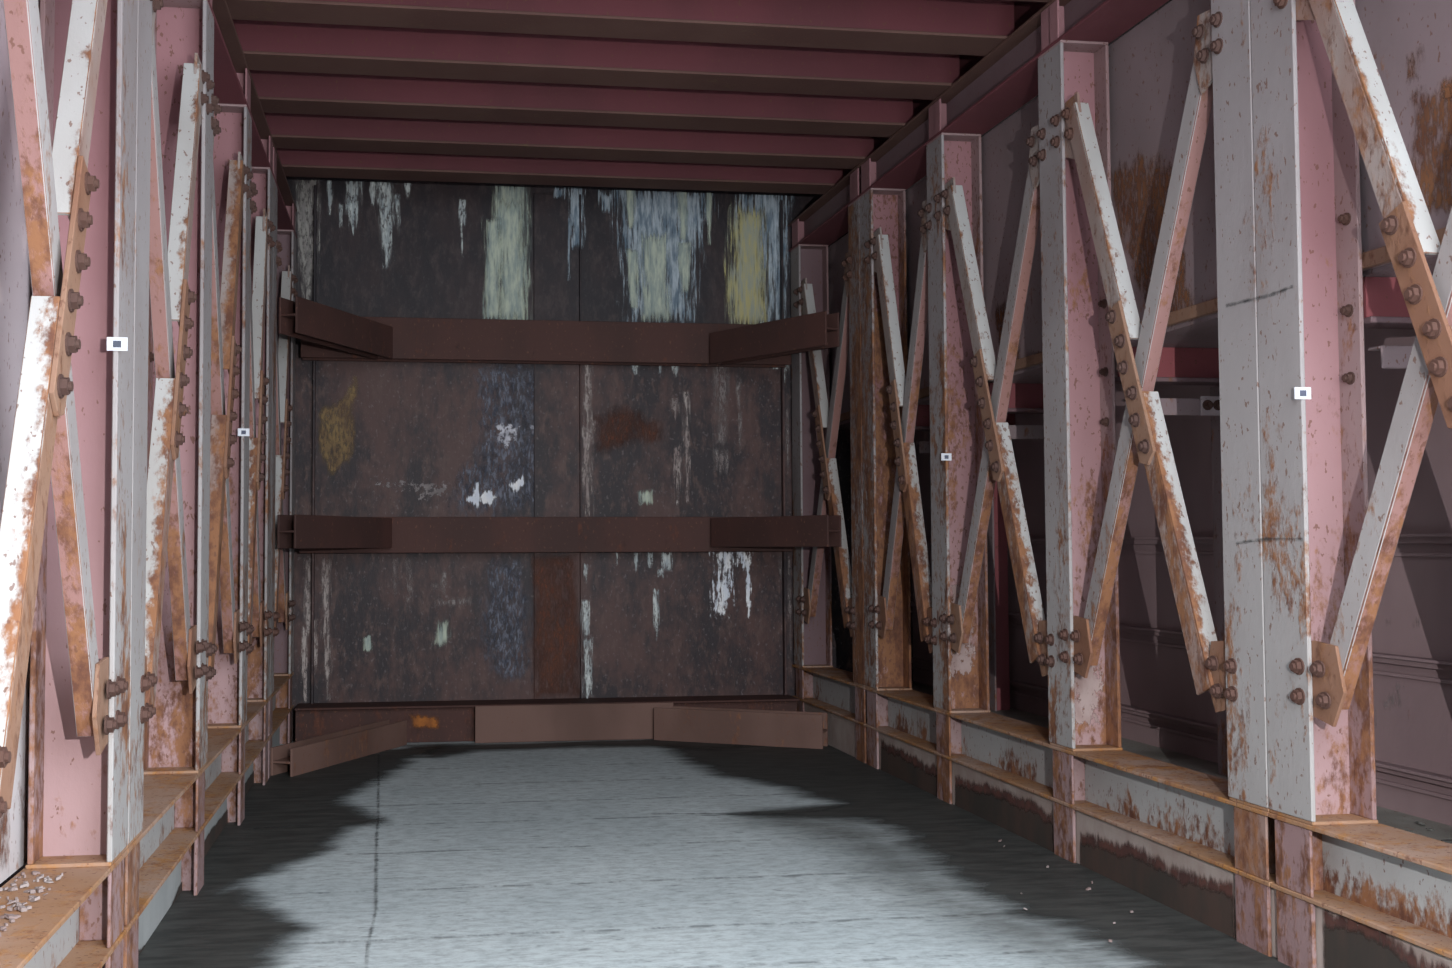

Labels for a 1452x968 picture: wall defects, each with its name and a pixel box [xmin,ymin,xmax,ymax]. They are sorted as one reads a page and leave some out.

corrosion [1407,60,1452,211]
water stain [296,180,410,300]
water stain [483,186,530,320]
water stain [554,187,793,324]
water stain [582,600,592,699]
water stain [616,553,673,632]
water stain [709,552,752,619]
corrosion [0,811,9,862]